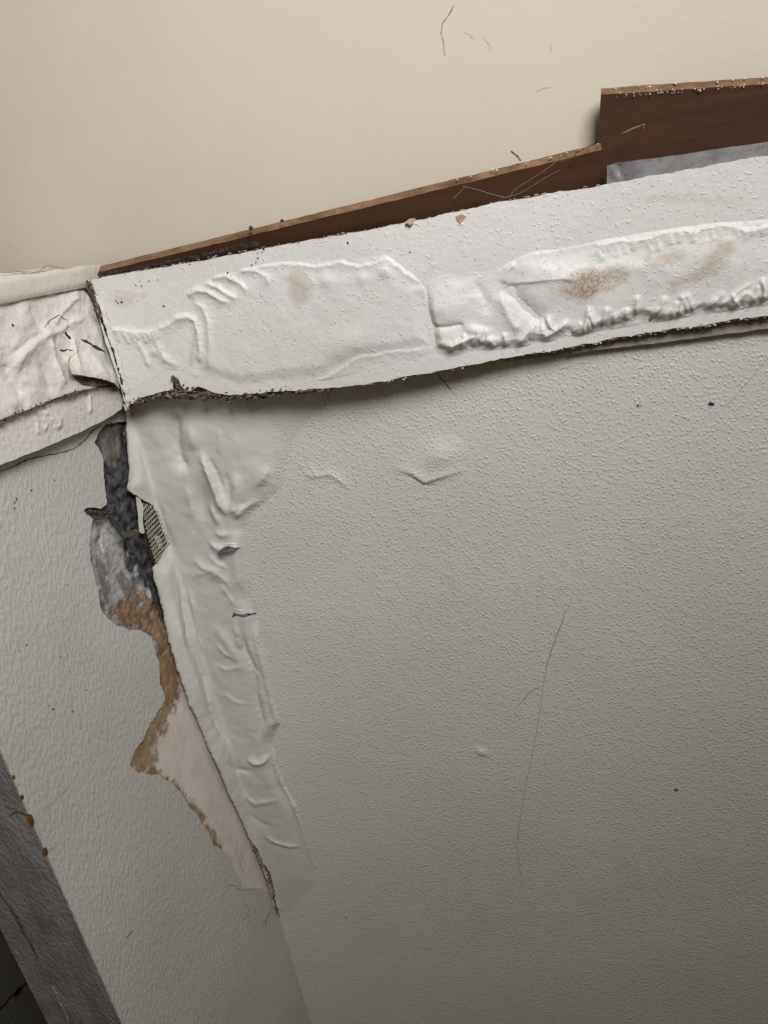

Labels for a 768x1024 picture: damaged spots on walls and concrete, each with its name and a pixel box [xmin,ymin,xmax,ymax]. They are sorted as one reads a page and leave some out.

peeling [0,289,120,425]
peeling [84,375,334,911]
crack [516,597,573,891]